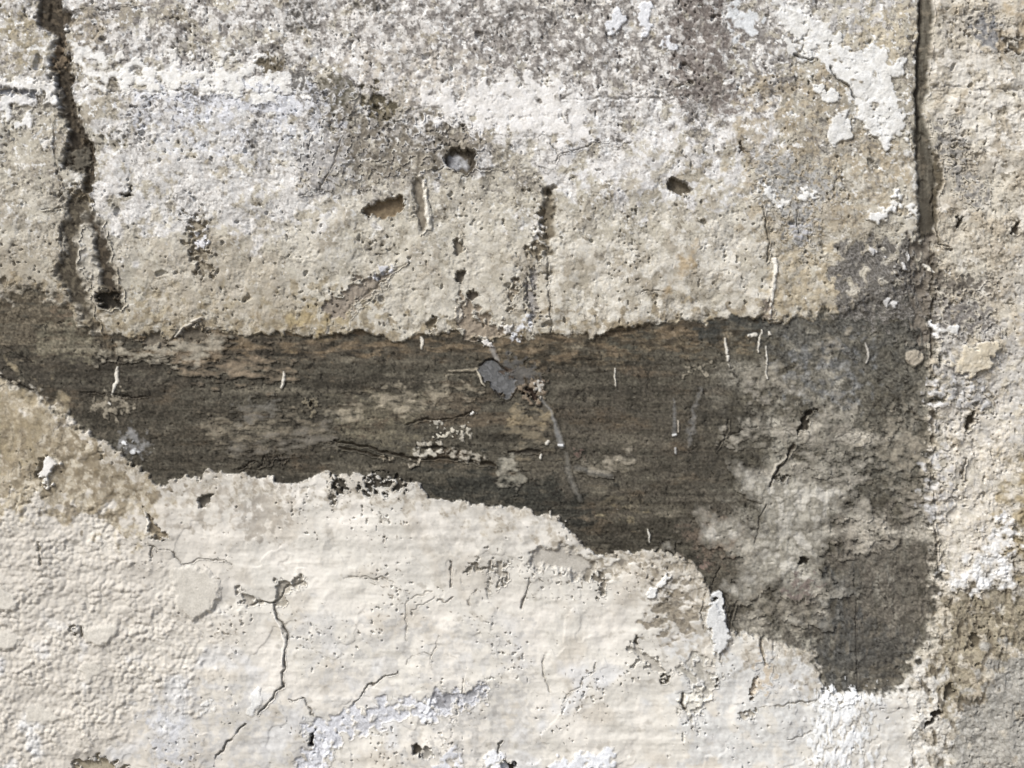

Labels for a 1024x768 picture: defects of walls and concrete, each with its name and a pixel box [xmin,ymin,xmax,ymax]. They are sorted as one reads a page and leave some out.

crack [32,0,178,364]
peeling [0,183,1002,729]
crack [148,544,233,567]
crack [213,600,315,768]
crack [342,560,479,703]